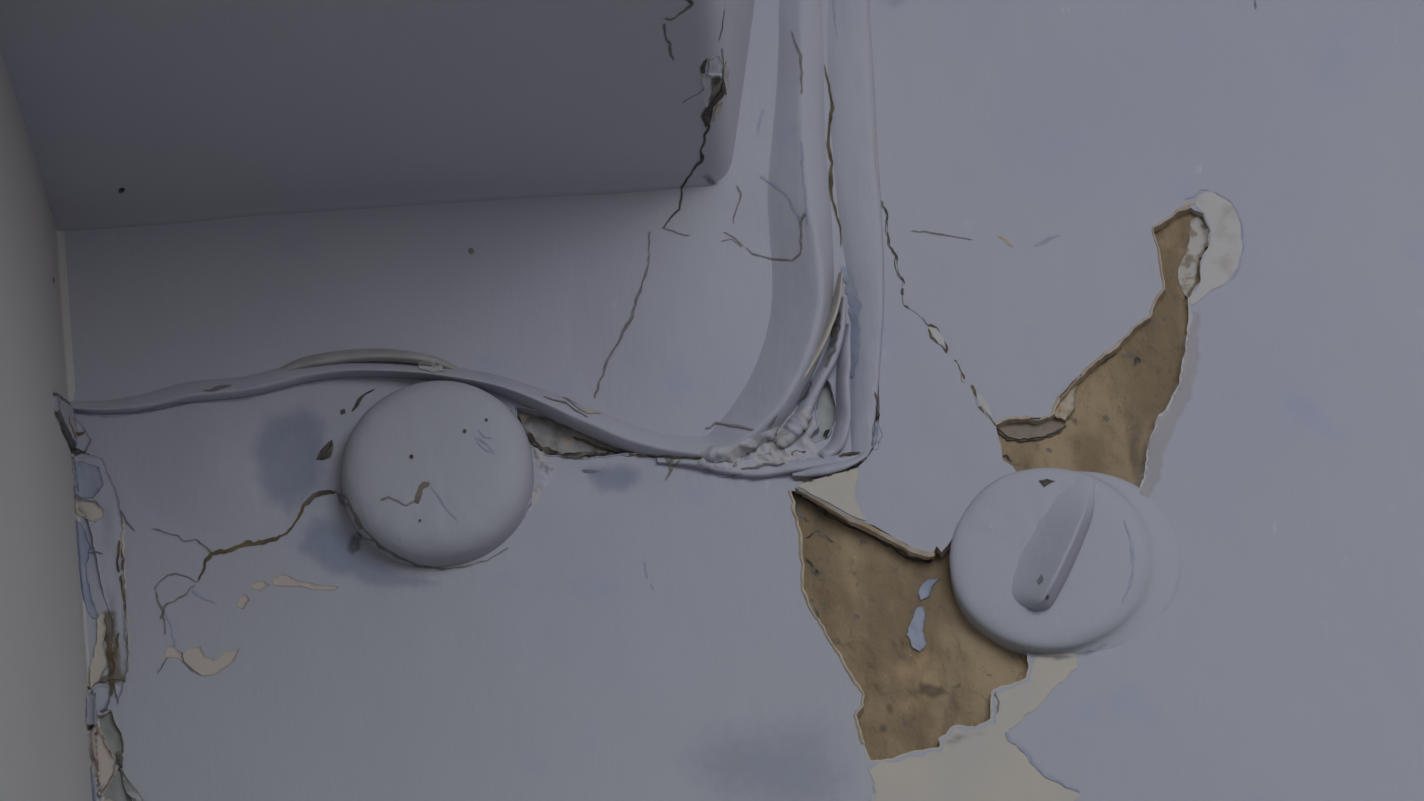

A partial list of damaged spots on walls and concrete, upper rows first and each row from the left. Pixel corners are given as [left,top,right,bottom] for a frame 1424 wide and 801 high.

peeling [53,392,136,801]
crack [153,441,336,650]
crack [518,0,842,480]
flaking render [657,266,1080,801]
crack [872,392,883,450]
crack [874,124,1060,426]
flaking render [995,189,1245,492]